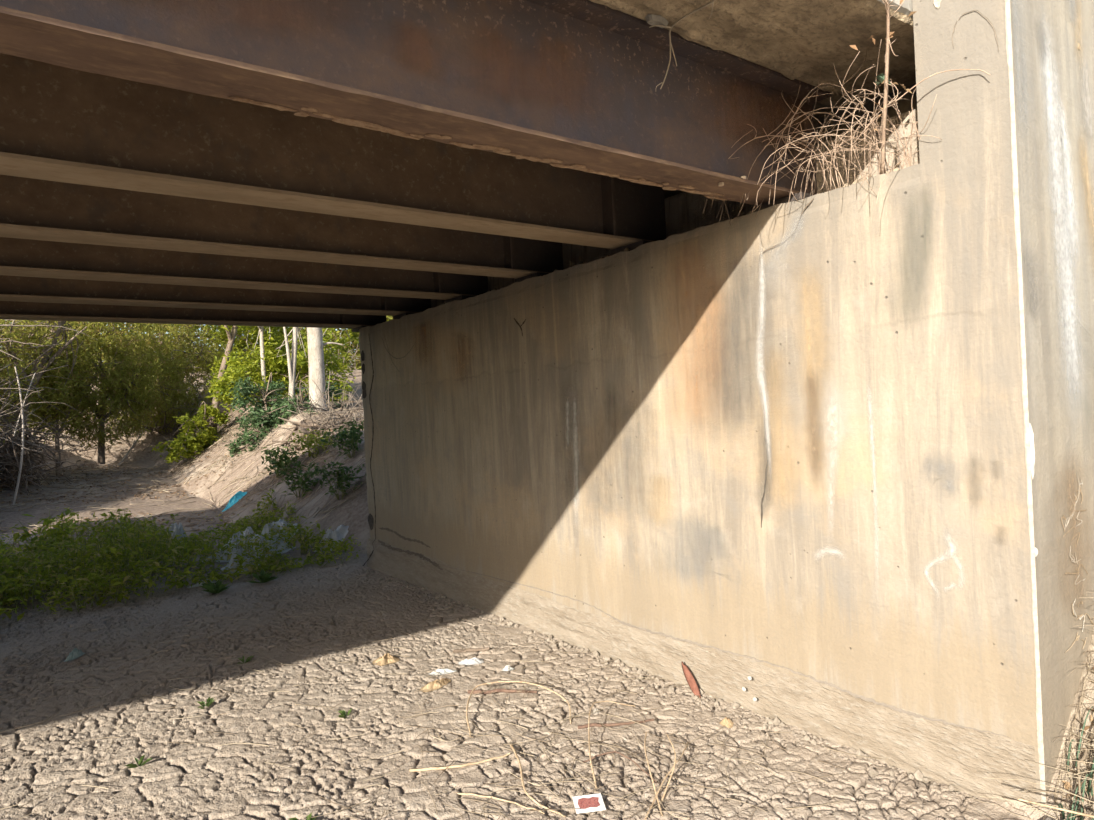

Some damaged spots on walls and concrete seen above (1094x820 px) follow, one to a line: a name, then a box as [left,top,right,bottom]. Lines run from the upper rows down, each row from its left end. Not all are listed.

corrosion [228,96,727,200]
efflorescence [1044,43,1078,384]
crack [362,338,443,570]
crack [760,404,768,528]
water stain [759,362,770,494]
water stain [810,380,838,468]